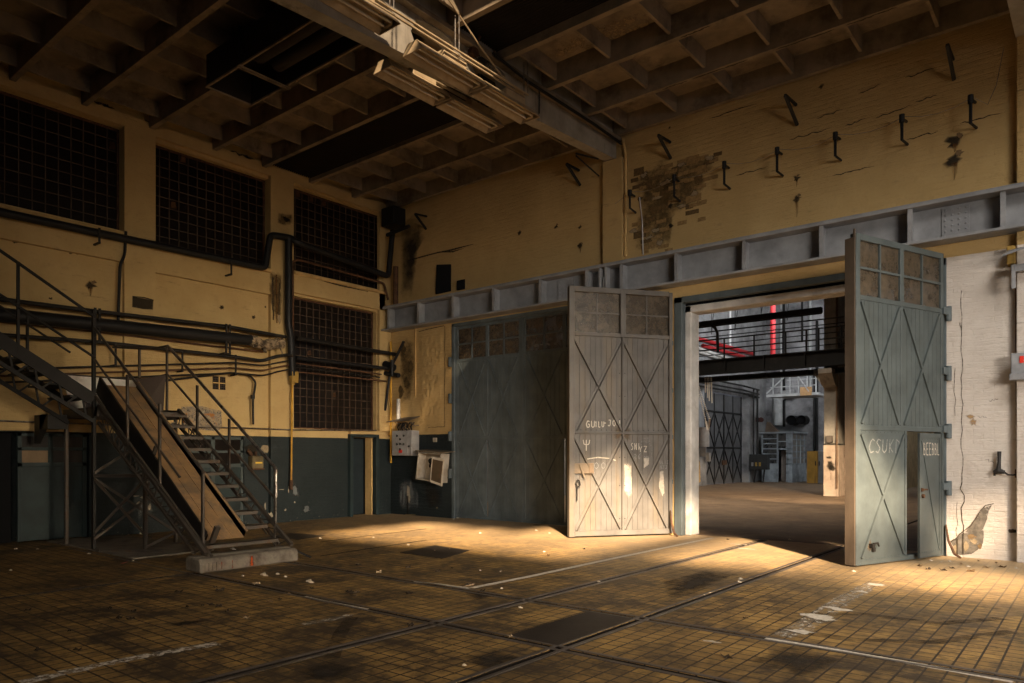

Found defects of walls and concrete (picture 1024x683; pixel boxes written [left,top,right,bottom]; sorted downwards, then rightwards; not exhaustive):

crack [789,68,936,140]
flaking render [629,151,722,254]
crack [954,291,998,536]
spalling [950,503,994,555]